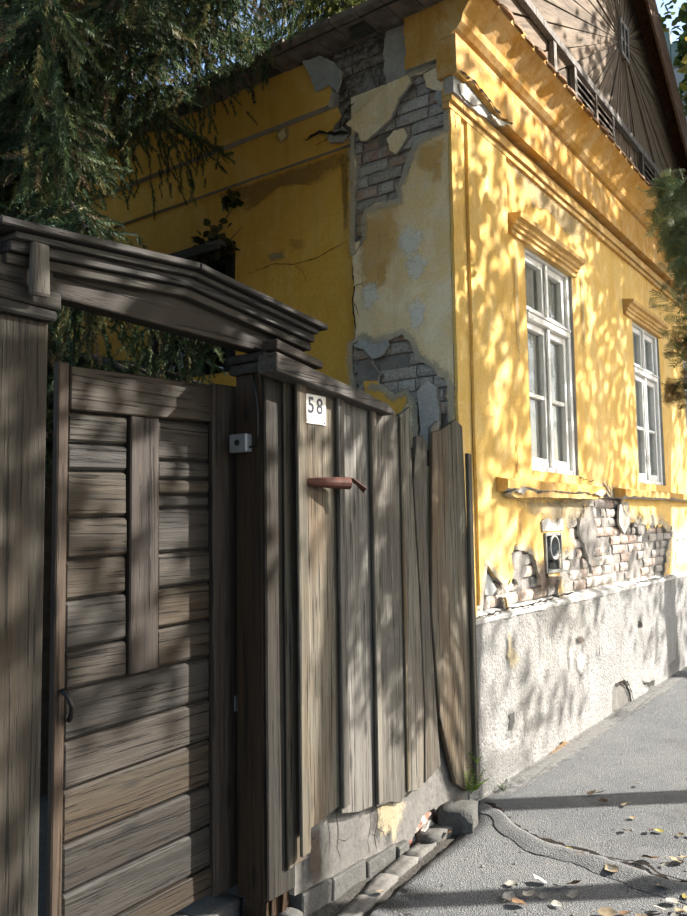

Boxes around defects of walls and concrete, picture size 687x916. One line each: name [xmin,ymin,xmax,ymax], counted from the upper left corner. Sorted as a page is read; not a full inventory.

spalling [302,25,456,256]
peeling [458,83,481,106]
peeling [489,115,511,127]
spalling [345,329,454,450]
spalling [477,483,684,617]
spalling [612,680,634,712]